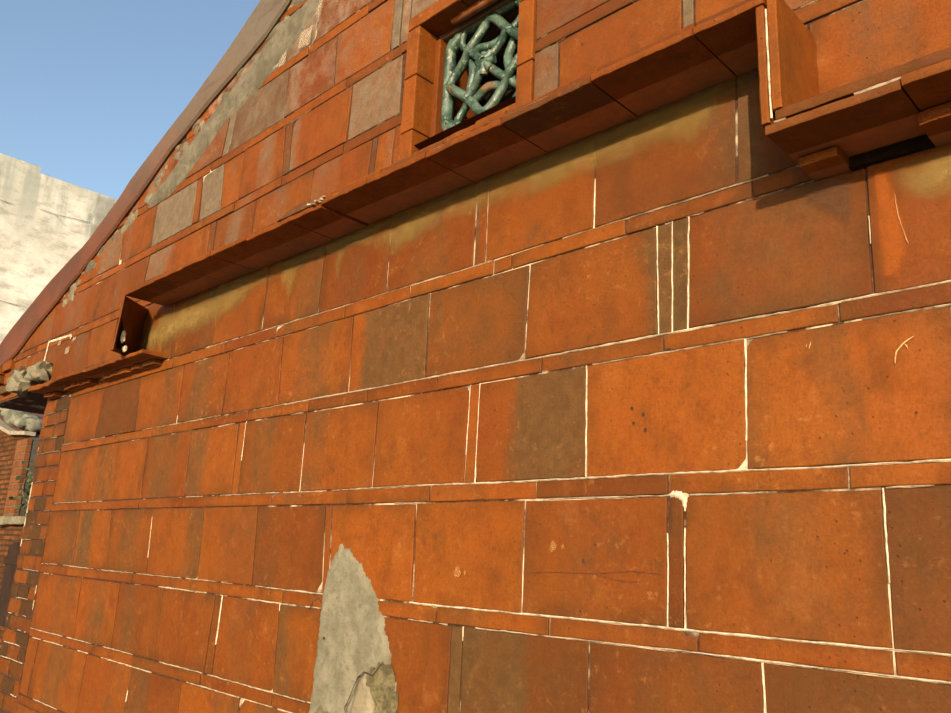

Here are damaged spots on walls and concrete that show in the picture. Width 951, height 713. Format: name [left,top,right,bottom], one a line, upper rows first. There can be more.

peeling [62,0,327,308]
damp [283,212,405,265]
damp [194,268,267,302]
spalling [350,662,398,713]